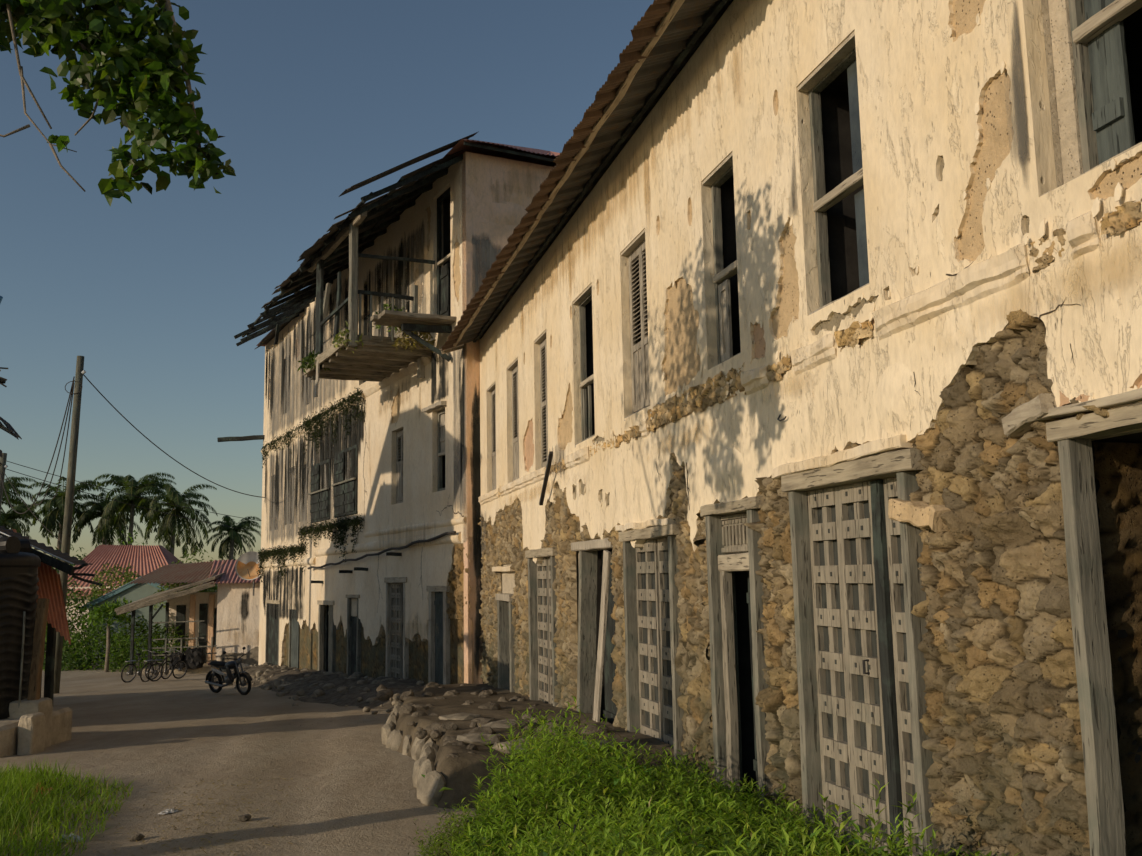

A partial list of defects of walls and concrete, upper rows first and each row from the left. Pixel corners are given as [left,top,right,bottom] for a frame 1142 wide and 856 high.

peeling [949,0,986,39]
peeling [955,61,1014,261]
leakage [1010,20,1027,164]
peeling [1091,154,1142,218]
leakage [364,223,426,338]
peeling [662,277,703,399]
peeling [740,216,800,379]
leakage [265,280,363,542]